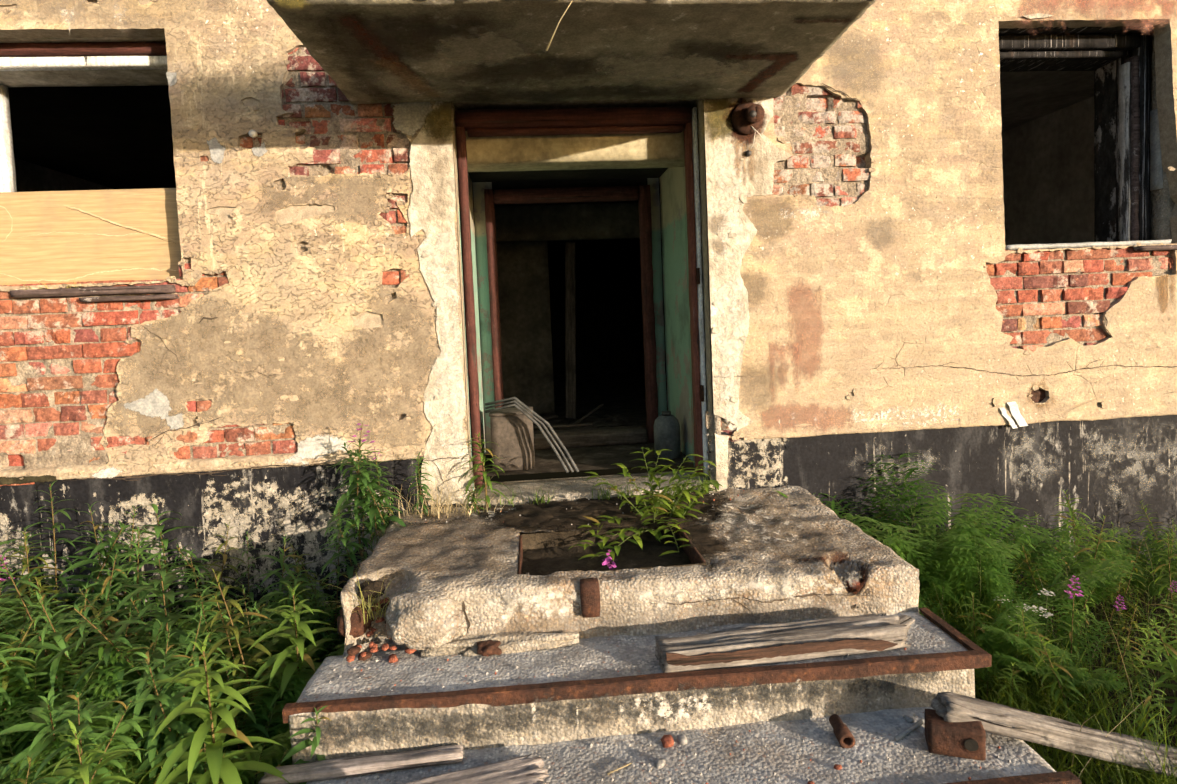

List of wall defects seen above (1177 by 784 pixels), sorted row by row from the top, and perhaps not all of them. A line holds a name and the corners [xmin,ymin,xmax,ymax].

flaking render [191,152,211,165]
flaking render [234,46,411,234]
flaking render [772,84,877,207]
flaking render [208,207,237,225]
flaking render [984,242,1177,356]
crack [873,314,1177,393]
flaking render [0,232,466,589]
damp [866,446,933,479]
damp [1008,431,1056,480]
damp [1089,430,1177,494]